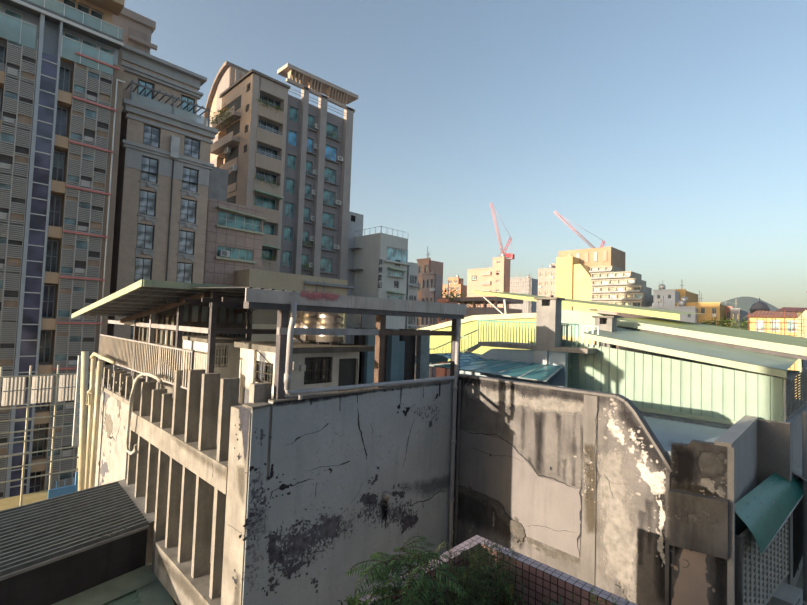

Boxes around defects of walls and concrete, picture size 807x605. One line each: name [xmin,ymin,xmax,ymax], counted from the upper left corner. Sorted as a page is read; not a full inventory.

leakage [242,474,267,595]
peeling [234,416,295,541]
peeling [262,531,318,596]
peeling [292,507,343,545]
crack [270,396,373,499]
leakage [267,500,418,587]
leakage [271,377,610,473]
crack [461,397,621,556]
leakage [582,434,639,591]
peeling [597,398,715,605]
leakage [620,403,715,601]
peeling [691,443,727,498]